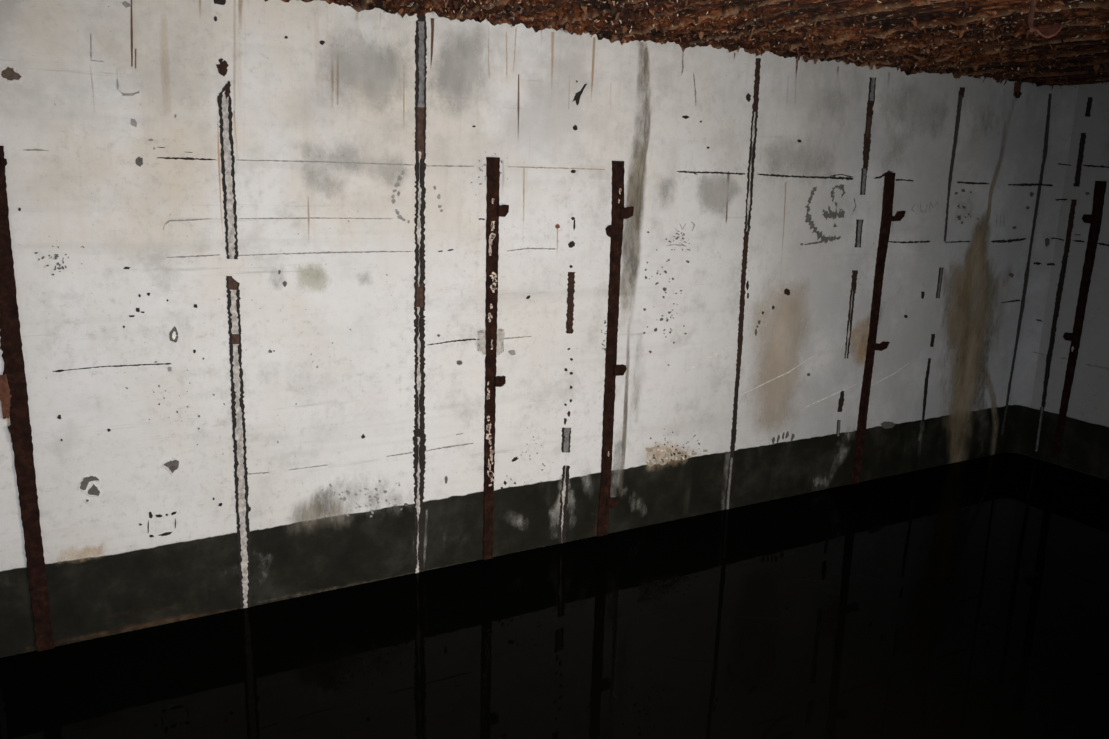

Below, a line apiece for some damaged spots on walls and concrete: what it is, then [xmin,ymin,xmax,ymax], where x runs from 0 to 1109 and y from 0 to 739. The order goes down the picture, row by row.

rust [0,146,55,651]
rust [483,157,509,560]
leakage [45,150,1109,646]
rust [596,161,634,537]
leakage [622,43,650,296]
rust [850,172,906,485]
rust [1051,181,1107,458]
leakage [0,567,37,658]